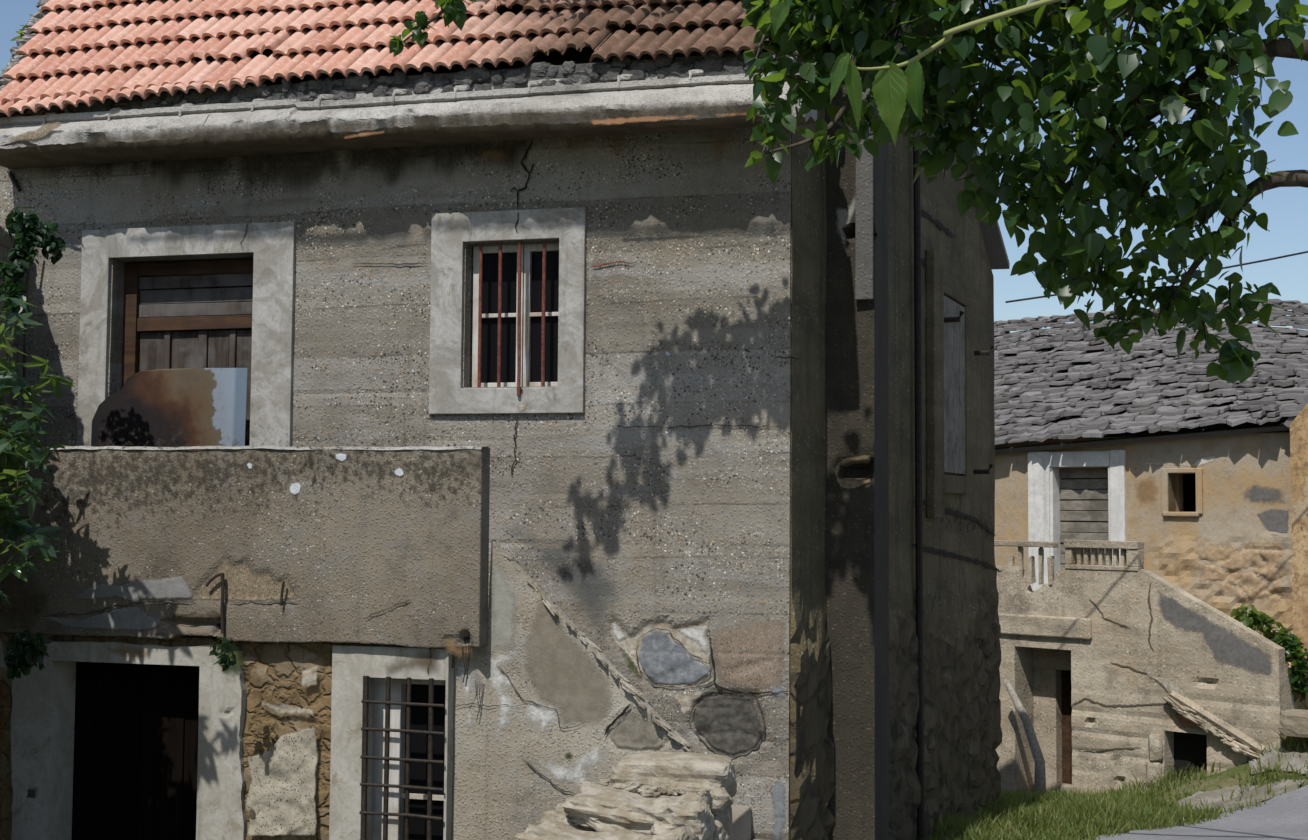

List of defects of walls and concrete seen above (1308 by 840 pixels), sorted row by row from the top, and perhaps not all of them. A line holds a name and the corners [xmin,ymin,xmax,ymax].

crack [511,139,534,233]
spalling [175,561,295,630]
crack [1072,583,1169,707]
crack [453,703,631,735]